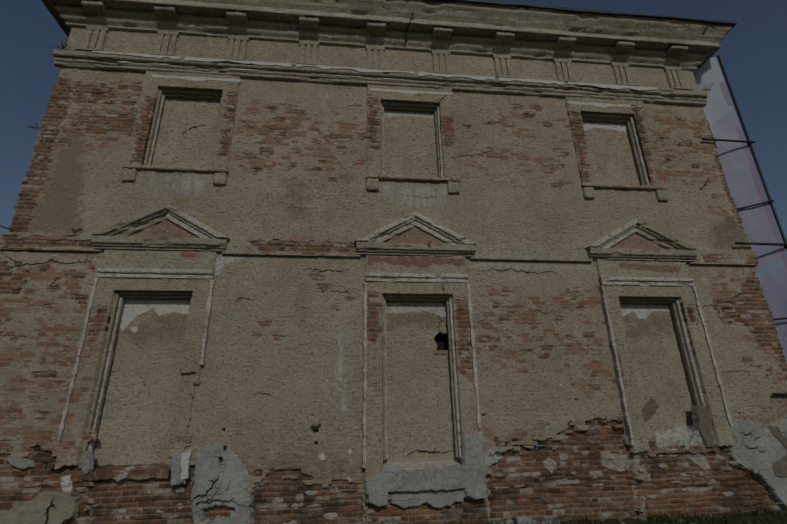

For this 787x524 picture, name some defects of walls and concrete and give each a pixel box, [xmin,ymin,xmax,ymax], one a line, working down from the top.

flaking render [2,51,657,252]
flaking render [551,101,744,230]
crack [0,252,91,290]
crack [303,268,351,294]
flaking render [366,288,514,376]
crack [478,266,558,275]
flaking render [712,252,787,384]
flaking render [0,437,195,524]
crack [189,476,247,507]
crack [407,448,455,456]
flaking render [251,419,783,524]
crack [737,430,767,480]